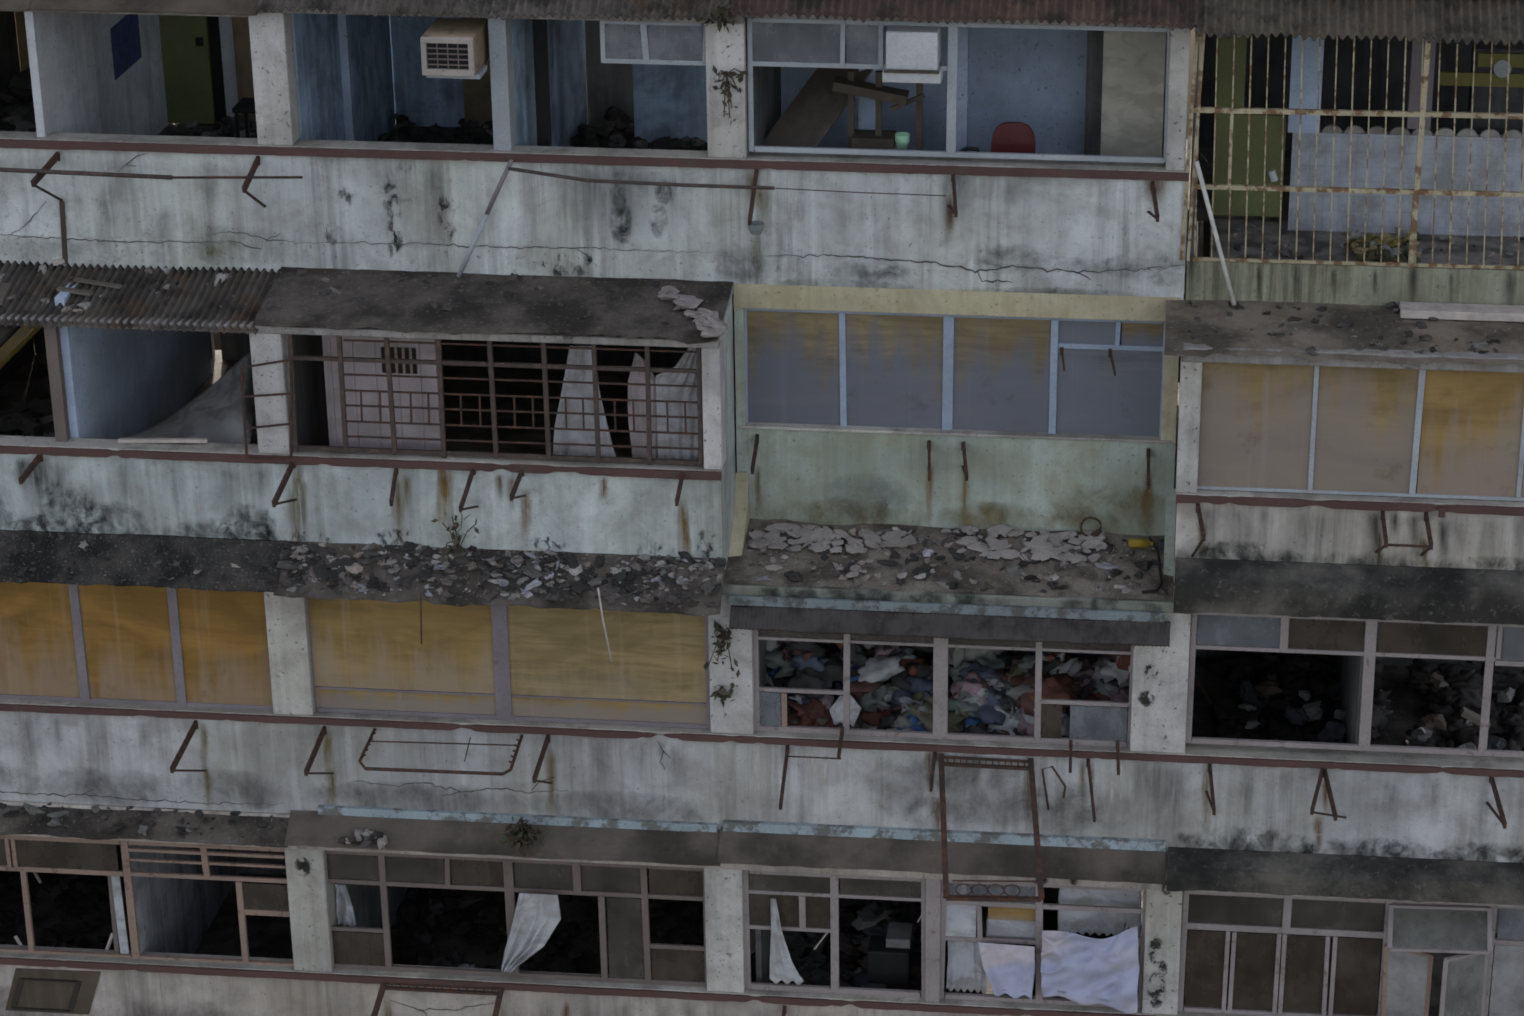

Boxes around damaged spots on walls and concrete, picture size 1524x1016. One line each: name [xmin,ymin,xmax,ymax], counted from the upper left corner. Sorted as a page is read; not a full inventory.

leakage [384,180,401,251]
crack [768,254,1181,283]
leakage [16,462,128,535]
leakage [185,513,272,541]
leakage [1457,846,1490,861]